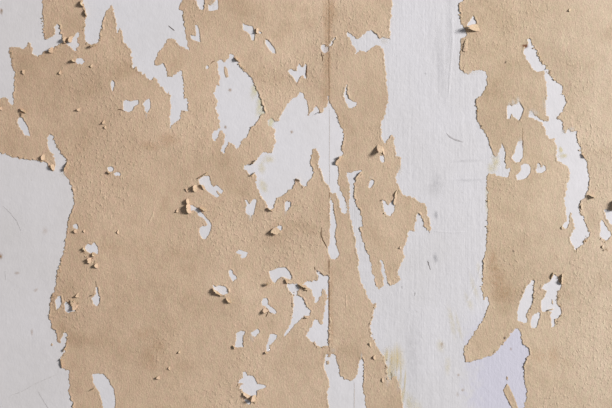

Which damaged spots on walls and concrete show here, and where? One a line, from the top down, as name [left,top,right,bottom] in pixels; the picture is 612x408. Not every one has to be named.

peeling [0,132,80,408]
peeling [0,0,202,138]
peeling [204,0,563,408]
peeling [505,36,612,253]
peeling [91,372,118,408]